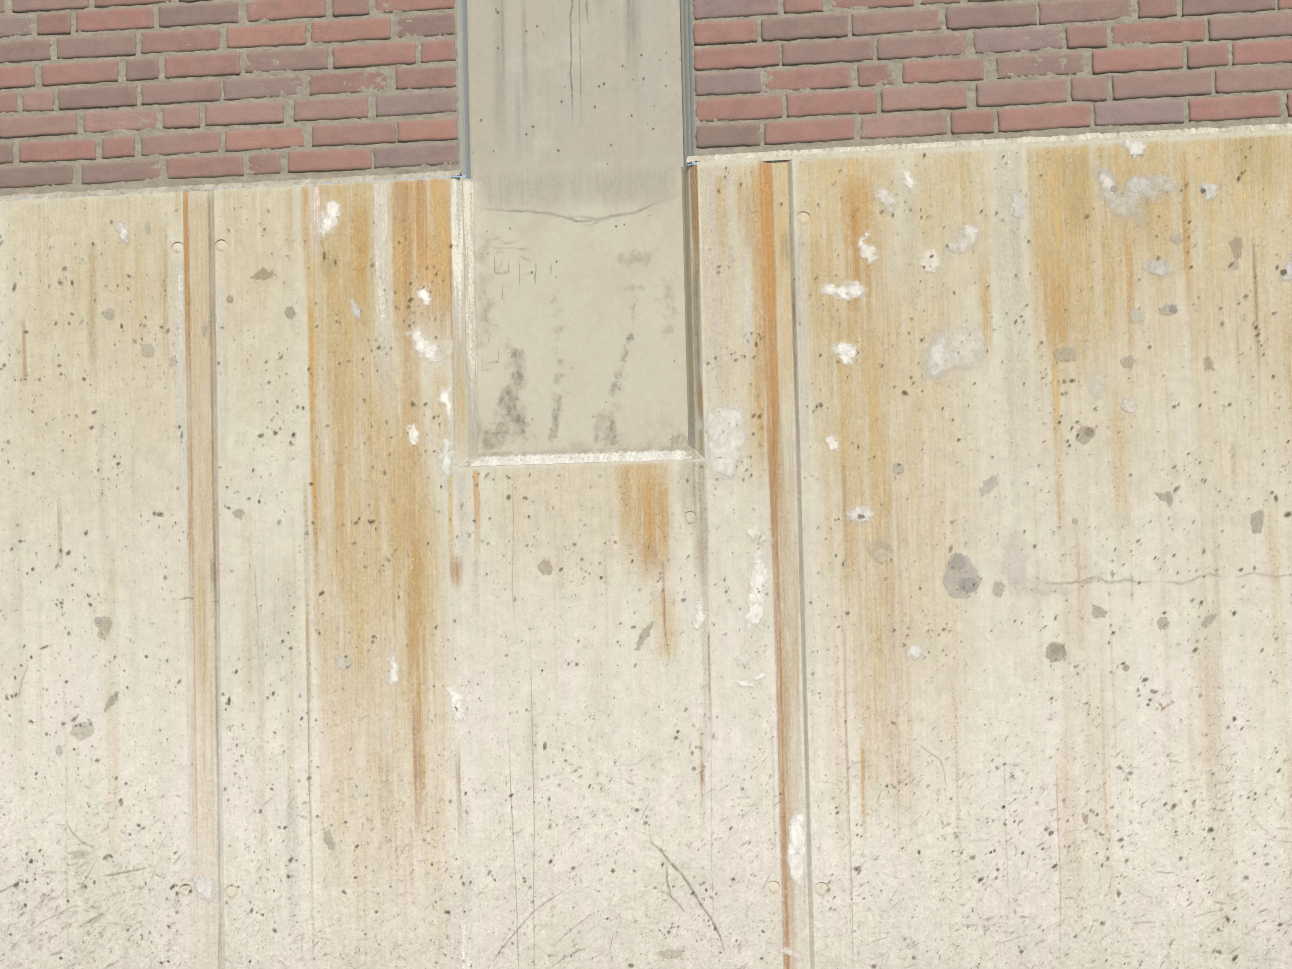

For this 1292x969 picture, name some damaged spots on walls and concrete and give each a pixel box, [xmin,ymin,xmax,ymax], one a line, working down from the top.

peeling [1124,138,1146,158]
peeling [1099,169,1173,217]
rust [393,180,451,313]
rust [307,246,338,517]
peeling [406,329,453,362]
rust [746,161,792,557]
peeling [928,328,983,377]
peeling [706,408,745,476]
peeling [744,525,768,629]
peeling [787,814,806,888]